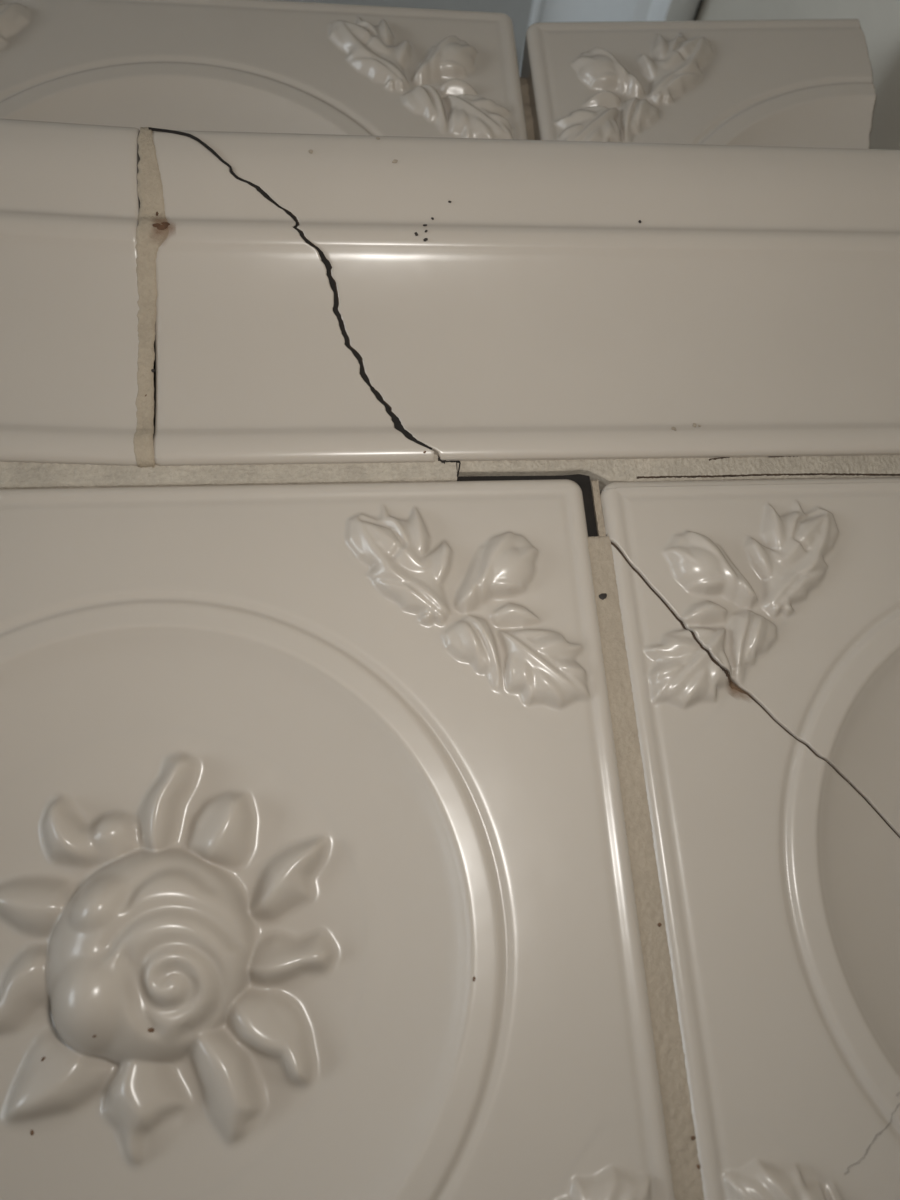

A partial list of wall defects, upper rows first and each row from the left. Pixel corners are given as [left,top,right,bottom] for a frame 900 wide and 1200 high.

crack [149,127,461,478]
crack [611,542,900,838]
crack [844,1092,900,1175]